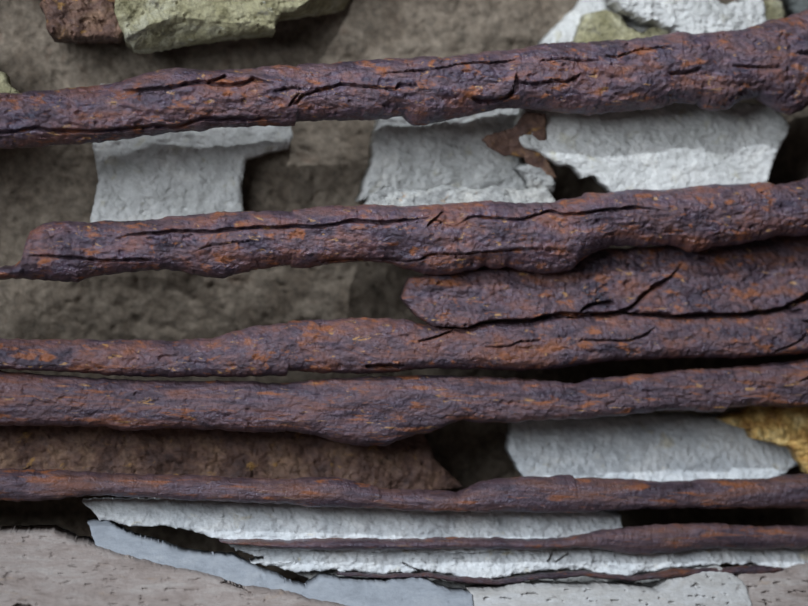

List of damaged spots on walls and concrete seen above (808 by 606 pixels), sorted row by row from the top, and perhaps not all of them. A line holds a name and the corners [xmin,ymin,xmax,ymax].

corrosion [716,406,808,474]